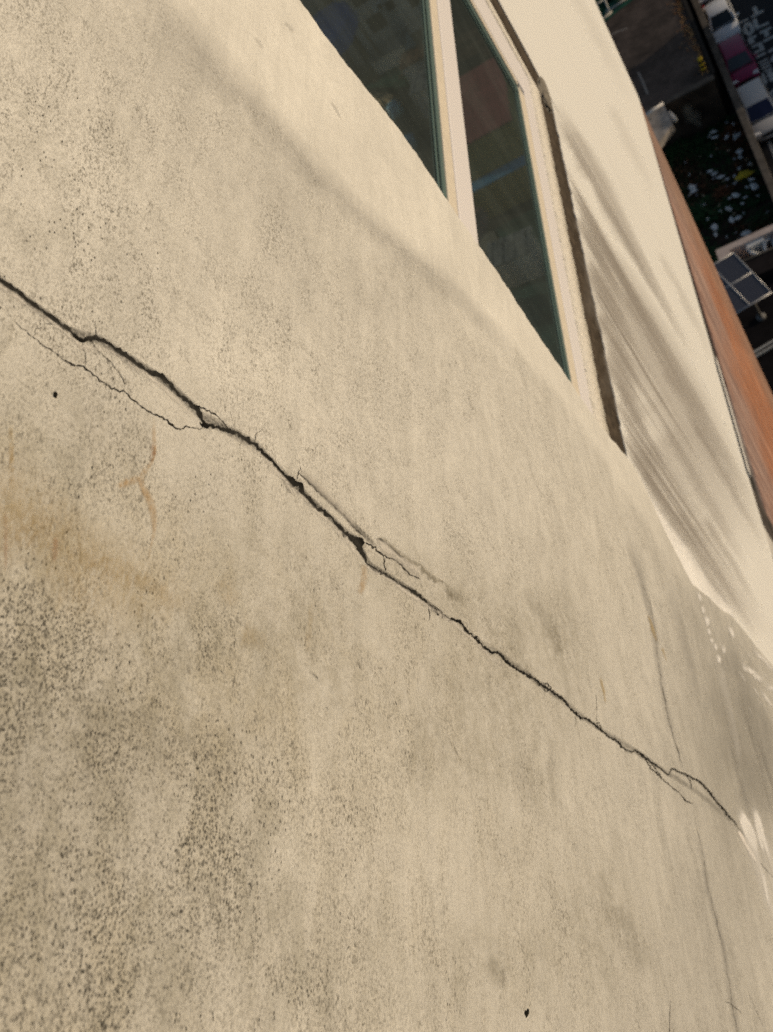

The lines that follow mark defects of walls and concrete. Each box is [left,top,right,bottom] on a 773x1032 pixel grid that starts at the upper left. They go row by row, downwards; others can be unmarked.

crack [0,278,773,877]